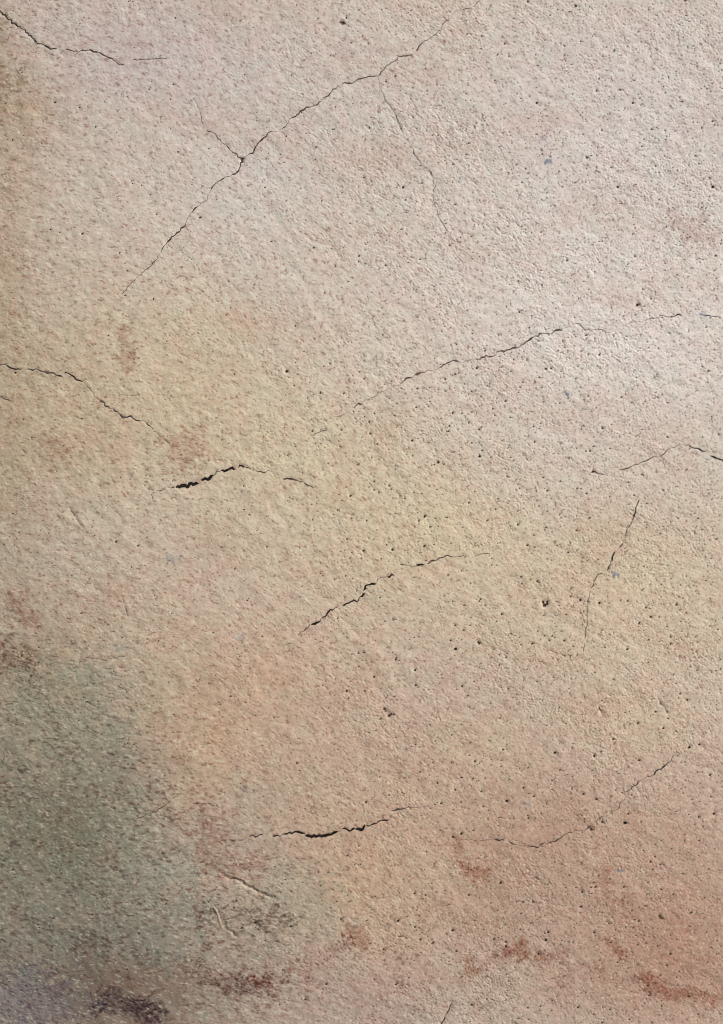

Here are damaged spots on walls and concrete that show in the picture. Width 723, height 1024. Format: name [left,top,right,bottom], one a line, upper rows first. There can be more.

crack [0,11,167,65]
crack [122,1,479,294]
crack [0,364,170,444]
crack [312,318,606,436]
crack [152,465,312,499]
crack [288,553,490,644]
crack [250,806,429,838]
crack [455,755,674,848]